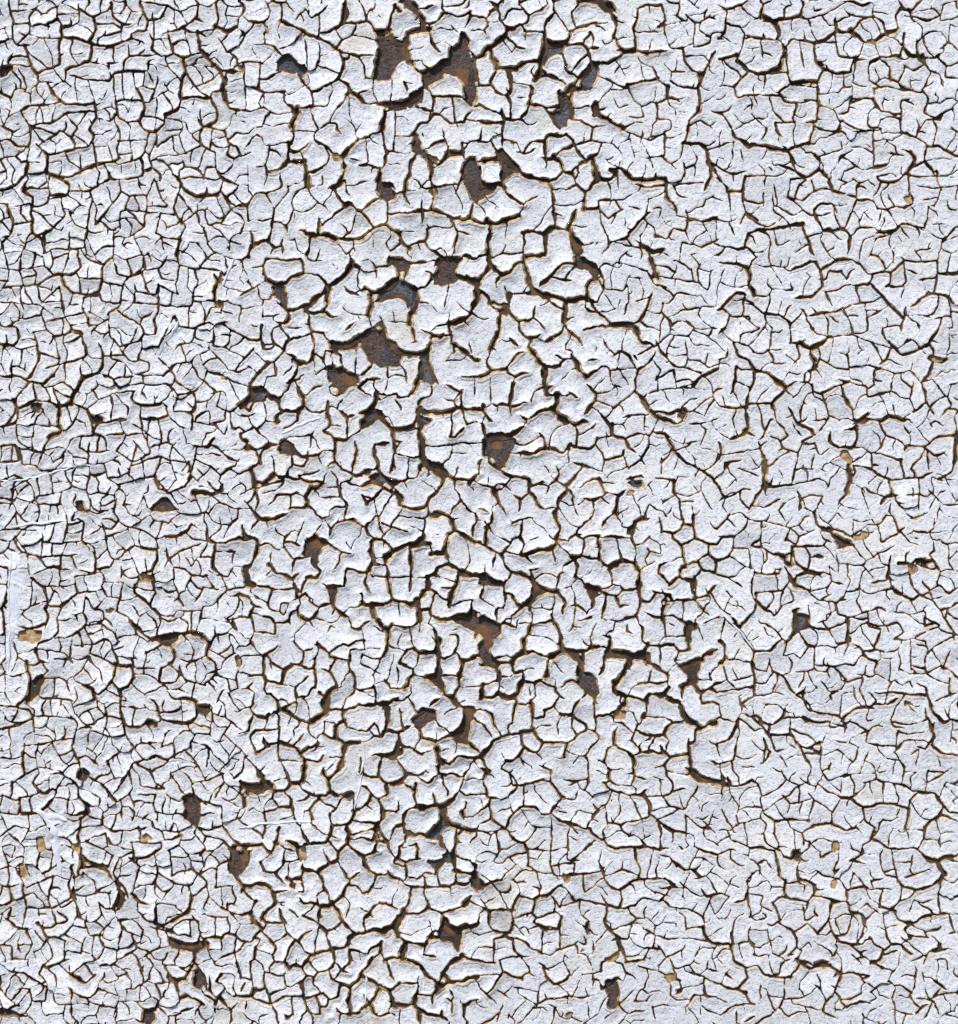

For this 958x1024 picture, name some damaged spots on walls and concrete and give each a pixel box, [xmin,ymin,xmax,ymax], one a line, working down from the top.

crack [395,150,417,205]
peeling [205,0,681,518]
crack [354,357,373,379]
crack [275,521,305,551]
peeling [302,535,328,564]
crack [0,566,9,646]
peeling [125,540,842,999]
crack [902,855,931,878]
crack [460,999,482,1024]
crack [539,955,575,990]
peeling [552,951,627,1024]
crack [746,974,838,1024]